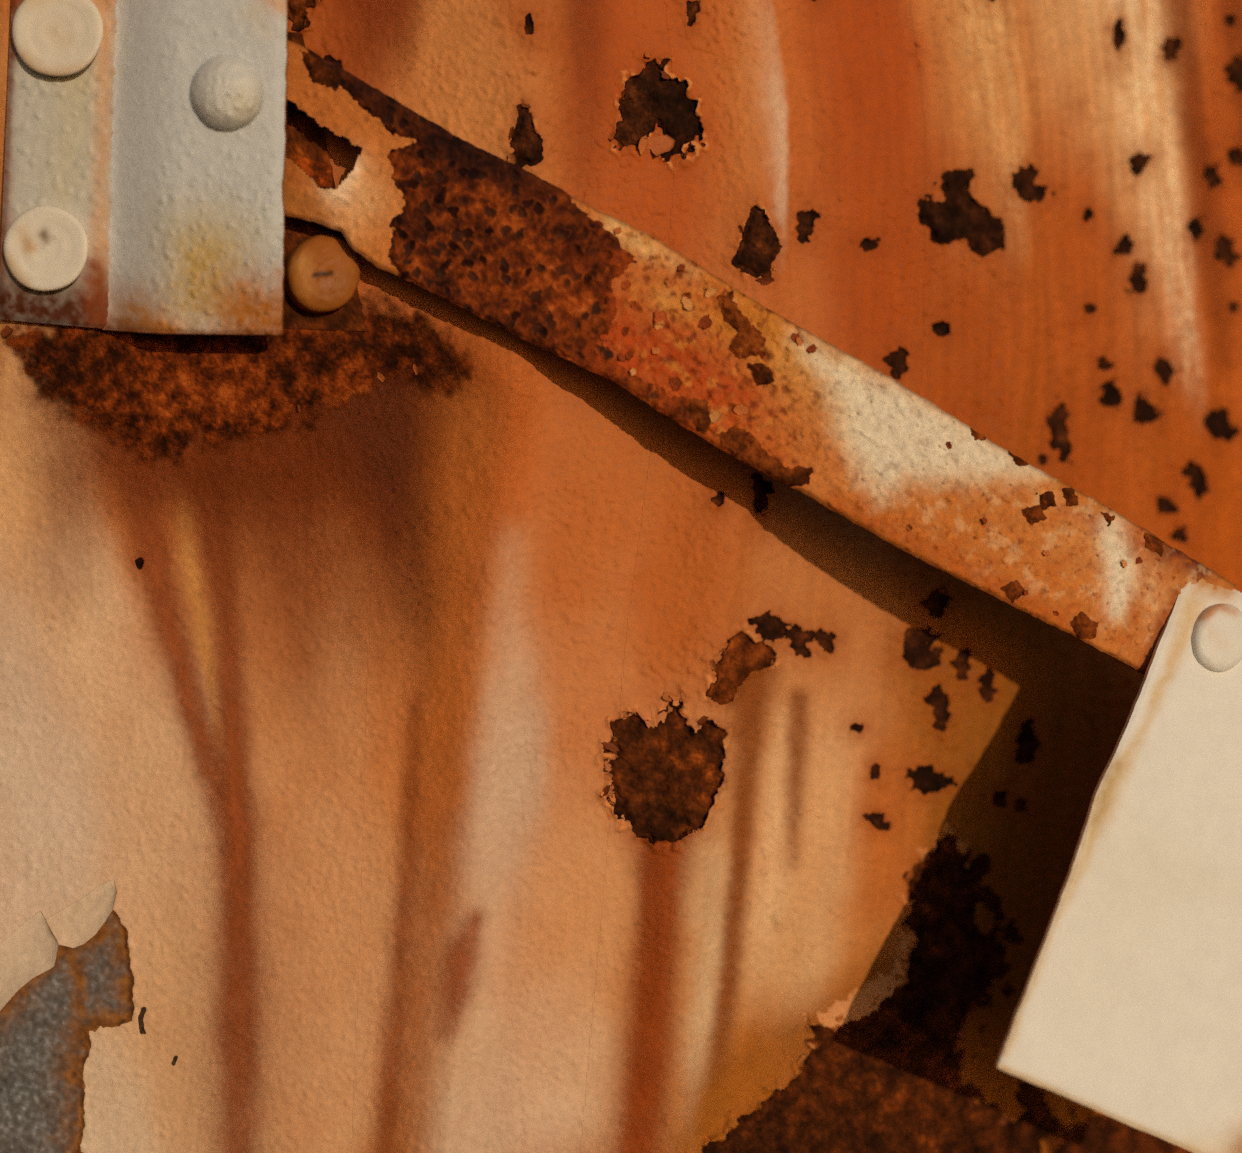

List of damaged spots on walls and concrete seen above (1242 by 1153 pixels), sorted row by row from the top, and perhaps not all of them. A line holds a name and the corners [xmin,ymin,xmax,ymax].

peeling [0,879,135,1153]
corrosion [617,838,684,1153]
corrosion [684,668,824,1153]